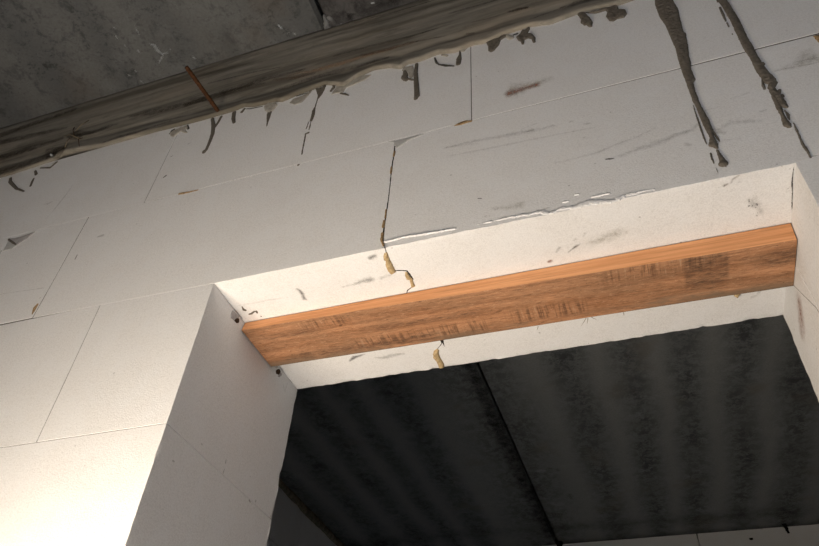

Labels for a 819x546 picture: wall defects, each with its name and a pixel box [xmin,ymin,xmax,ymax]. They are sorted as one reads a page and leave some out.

damp [0,108,76,174]
crack [380,146,415,292]
crack [433,340,445,369]